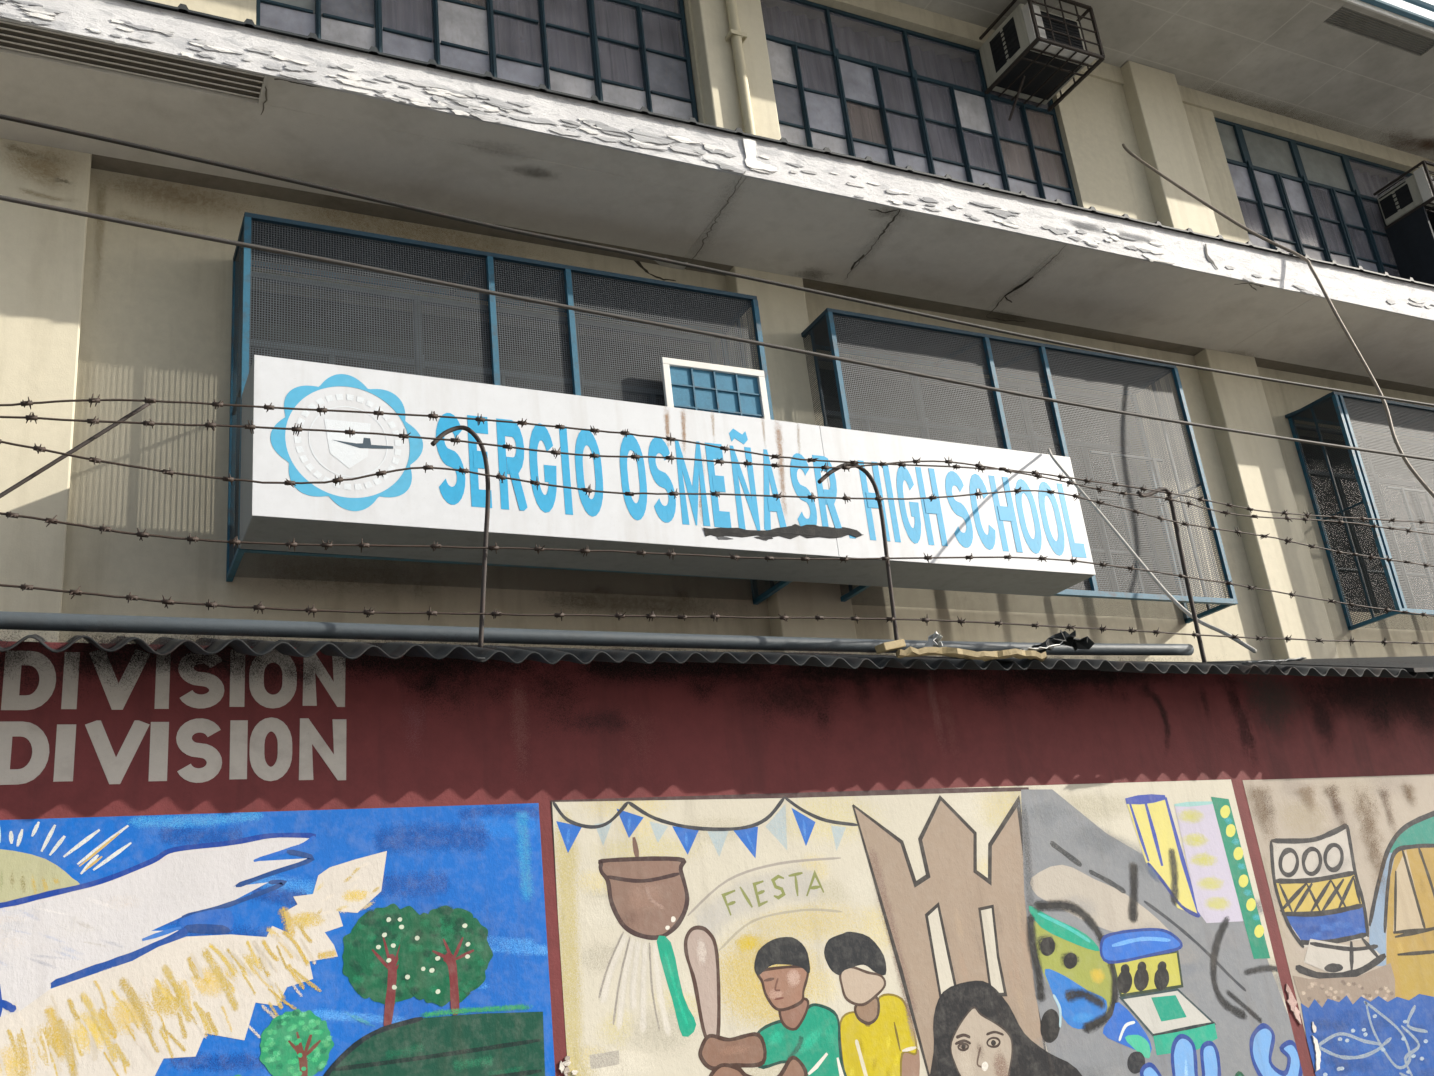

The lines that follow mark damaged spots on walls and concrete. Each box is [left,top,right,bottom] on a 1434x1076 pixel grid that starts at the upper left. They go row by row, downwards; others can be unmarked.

peeling [0,0,64,25]
peeling [86,19,174,44]
peeling [180,37,1021,228]
crack [633,168,756,281]
crack [844,207,912,280]
peeling [1041,220,1175,264]
crack [982,245,1070,324]
peeling [1225,265,1323,296]
peeling [1387,297,1434,309]